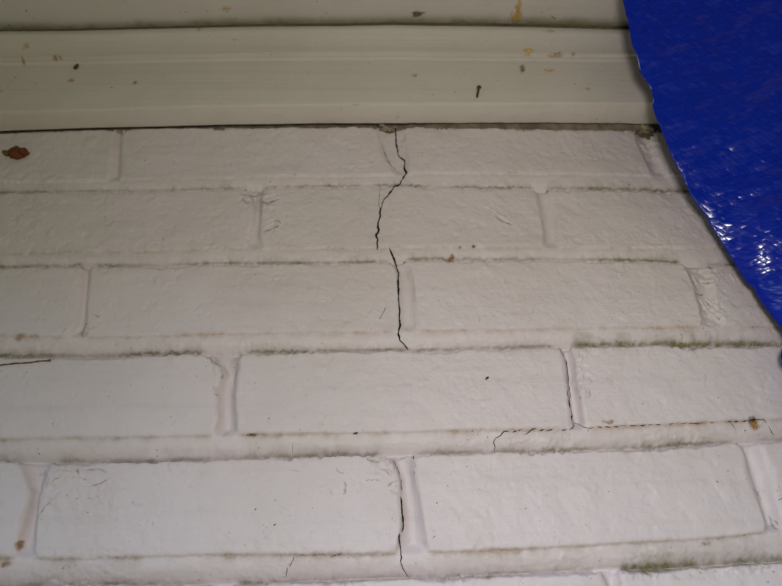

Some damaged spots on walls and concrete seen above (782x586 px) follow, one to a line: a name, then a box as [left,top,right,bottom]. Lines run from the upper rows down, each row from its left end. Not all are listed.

crack [375,128,408,350]
crack [493,349,774,450]
crack [393,456,415,578]